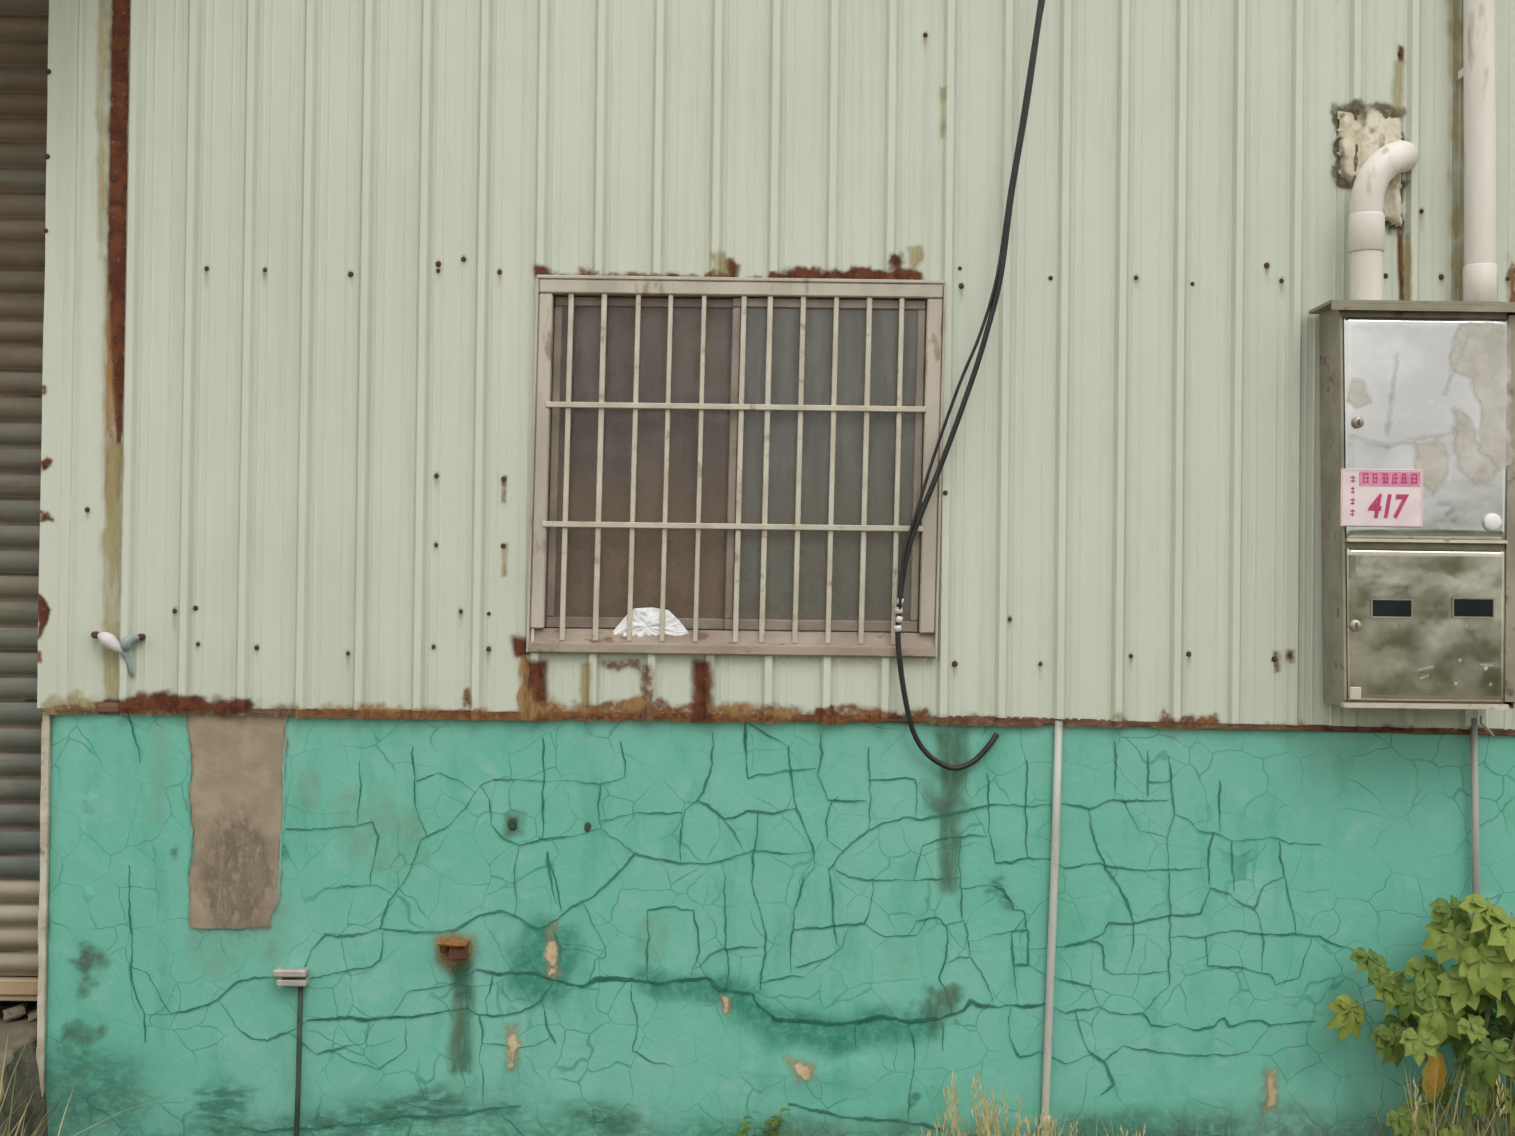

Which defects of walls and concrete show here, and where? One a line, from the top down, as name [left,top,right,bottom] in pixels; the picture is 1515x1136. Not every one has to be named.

corrosion [44,0,1044,727]
crack [127,713,140,758]
corrosion [1066,719,1132,728]
corrosion [1150,711,1334,731]
water stain [939,733,965,888]
crack [128,722,1353,1136]
peeling [544,941,557,976]
peeling [507,1028,520,1068]
peeling [794,1062,811,1080]
peeling [1267,1069,1278,1107]